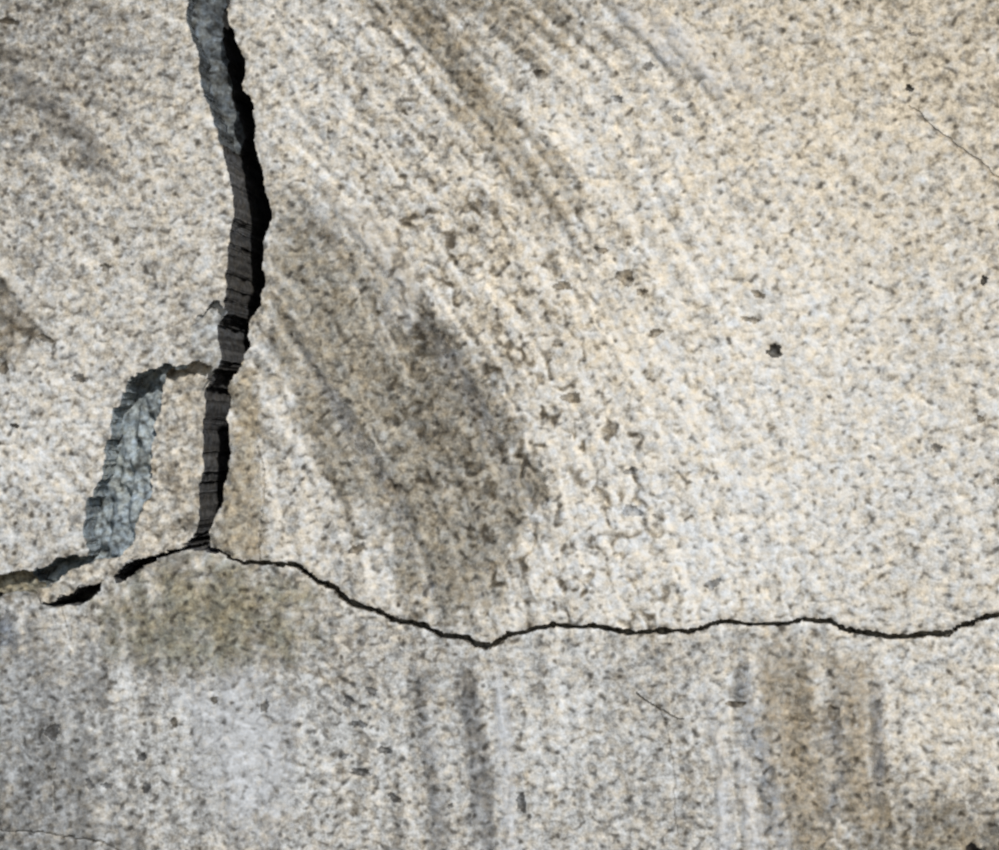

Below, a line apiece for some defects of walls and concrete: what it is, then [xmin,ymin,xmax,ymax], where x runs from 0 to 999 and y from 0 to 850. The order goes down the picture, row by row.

spalling [33,359,214,603]
crack [0,0,999,650]